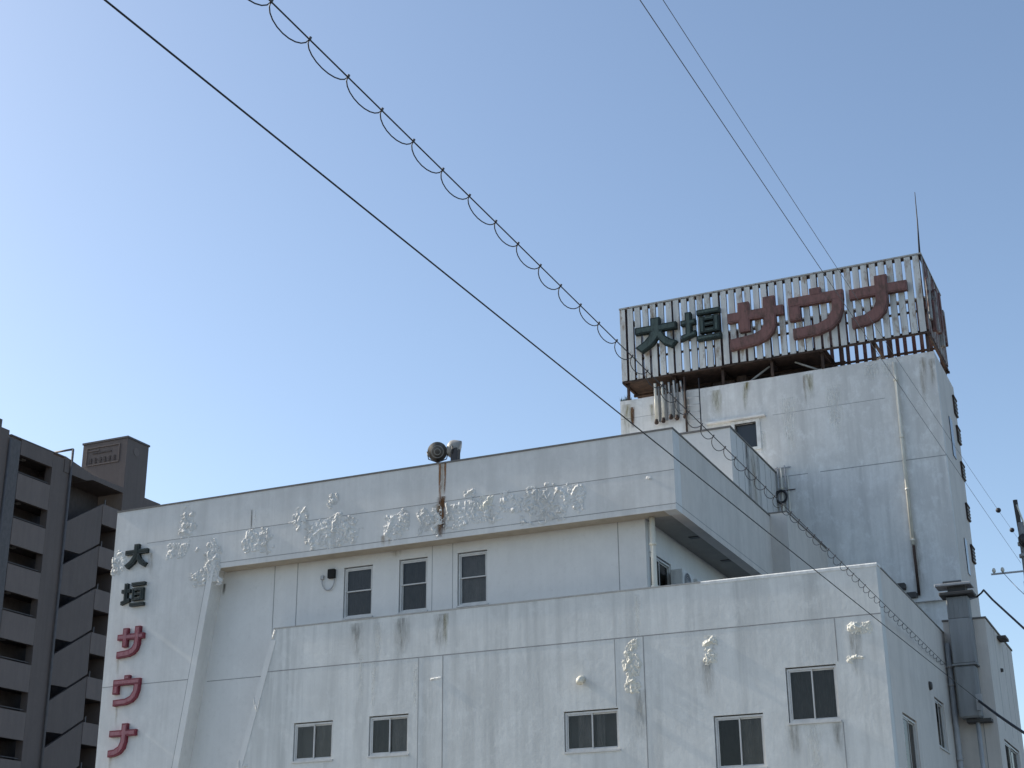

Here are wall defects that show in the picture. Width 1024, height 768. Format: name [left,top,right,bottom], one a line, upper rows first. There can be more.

rust [438,463,446,533]